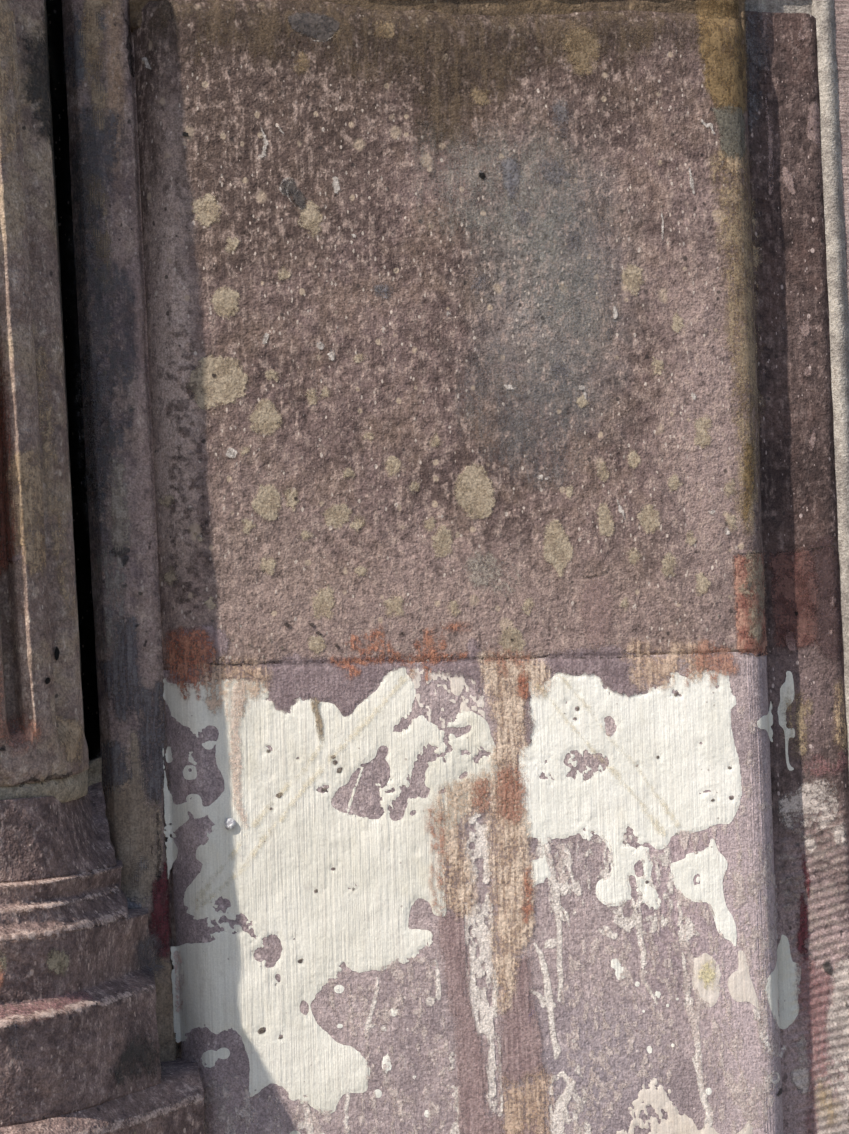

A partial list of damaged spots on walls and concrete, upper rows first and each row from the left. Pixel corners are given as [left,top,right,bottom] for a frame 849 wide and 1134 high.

rust [163,628,271,826]
peeling [162,656,503,1117]
rust [331,624,551,1012]
peeling [518,670,846,1029]
rust [627,640,738,688]
rust [503,1069,552,1134]
peeling [617,1078,719,1134]